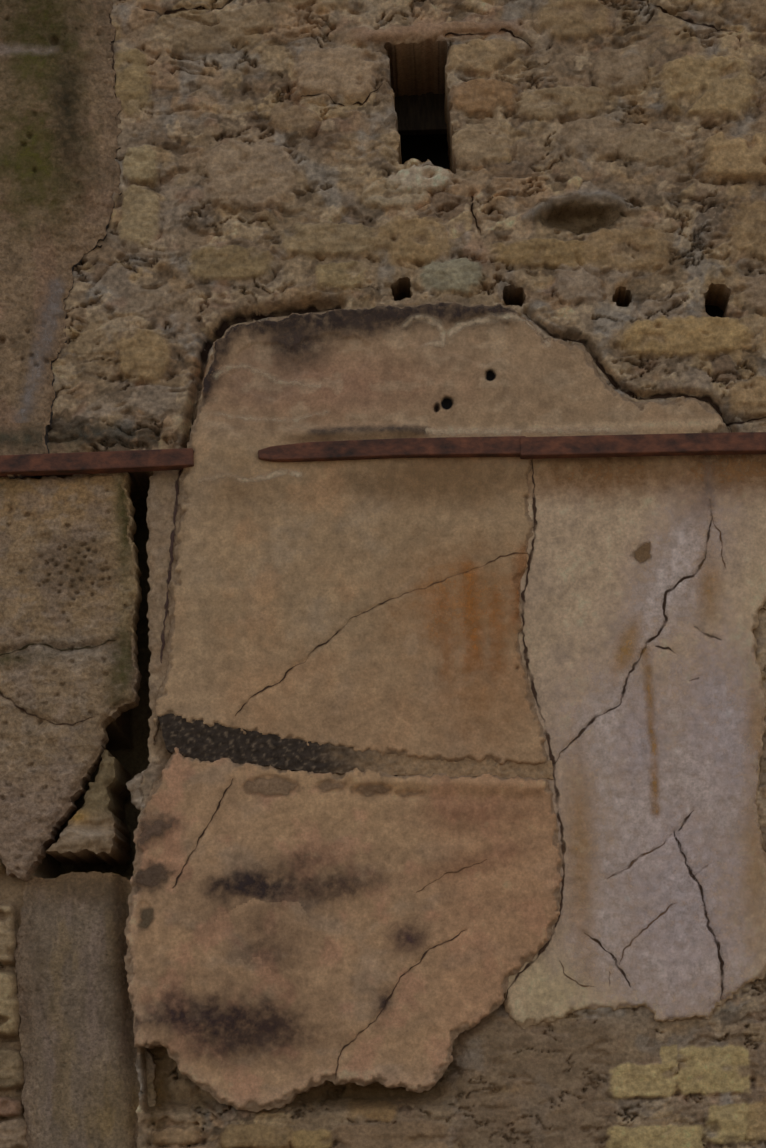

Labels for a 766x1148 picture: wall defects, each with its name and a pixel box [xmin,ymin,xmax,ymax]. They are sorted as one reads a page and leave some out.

crack [235,461,539,716]
crack [173,779,233,888]
crack [505,501,726,1000]
crack [336,930,465,1071]